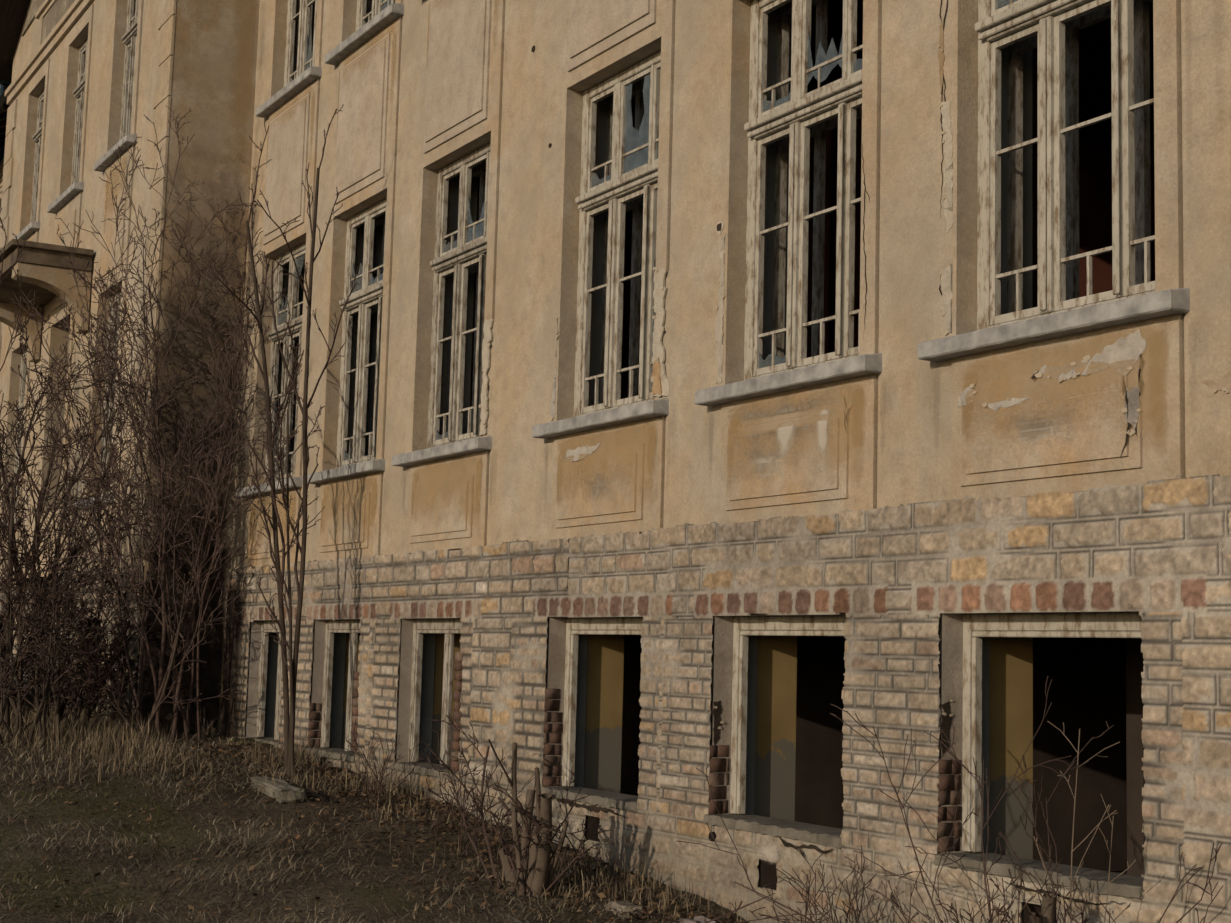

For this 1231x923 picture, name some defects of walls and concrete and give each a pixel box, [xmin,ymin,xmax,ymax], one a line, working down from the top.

crack [939,0,948,31]
crack [939,76,947,218]
spalling [938,20,954,234]
spalling [651,268,670,397]
spalling [958,383,1030,411]
spalling [1031,329,1147,436]